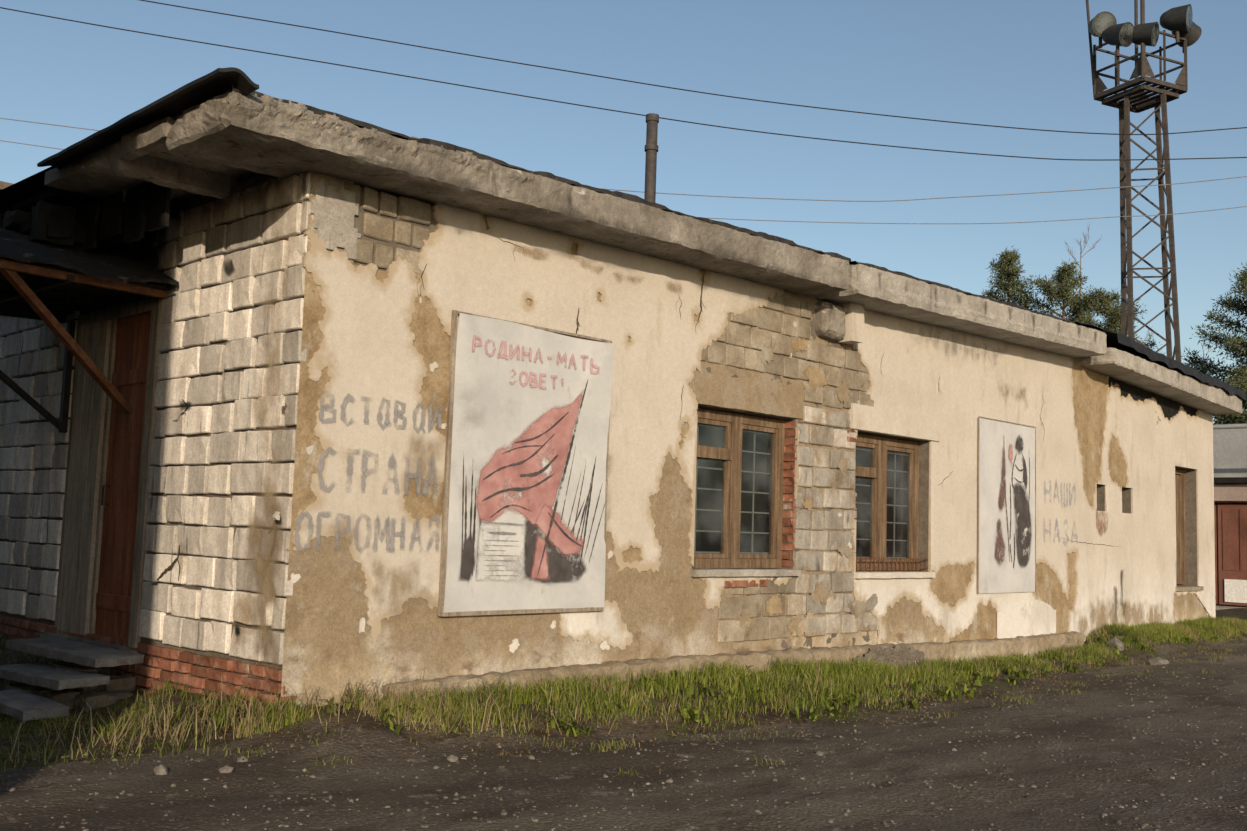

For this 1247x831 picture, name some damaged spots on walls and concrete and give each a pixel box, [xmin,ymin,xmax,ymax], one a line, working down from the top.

crack [676,273,704,329]
peeling [1072,357,1198,507]
peeling [273,271,768,709]
peeling [854,561,997,670]
peeling [1034,552,1076,633]